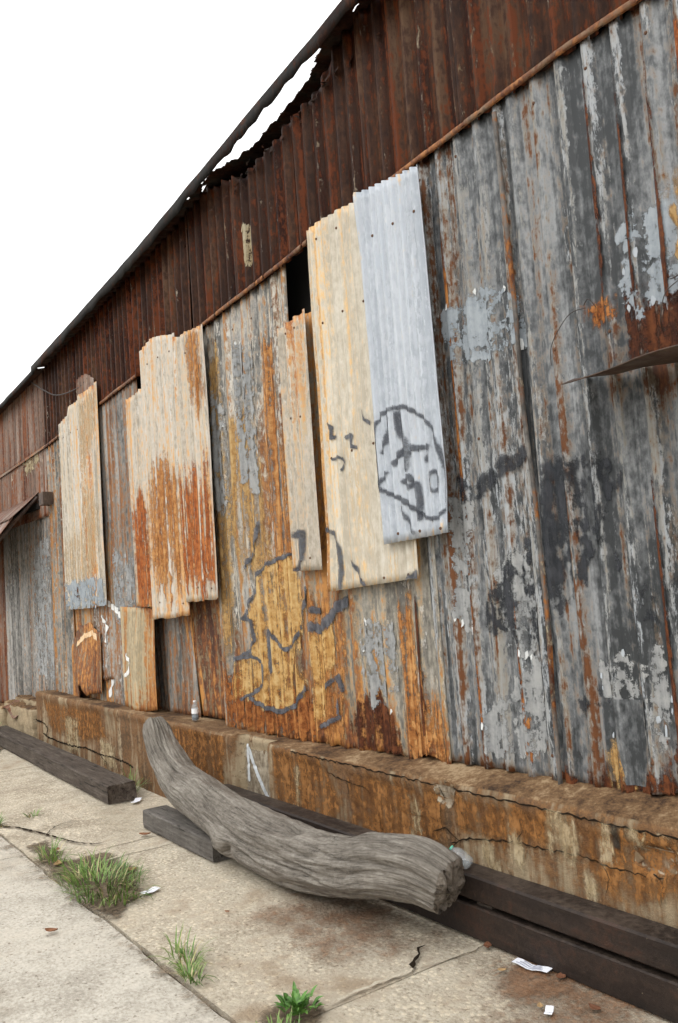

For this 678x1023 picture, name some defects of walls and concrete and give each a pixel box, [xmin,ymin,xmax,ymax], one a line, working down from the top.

rust [582,50,678,372]
peeling [615,183,678,320]
rust [132,329,292,655]
crack [36,719,133,768]
rust [172,589,551,858]
peeling [481,549,549,763]
rust [562,480,678,796]
peeling [598,644,673,750]
crack [0,821,172,859]
crack [290,751,678,892]
rust [584,828,678,906]
crack [327,944,483,1005]